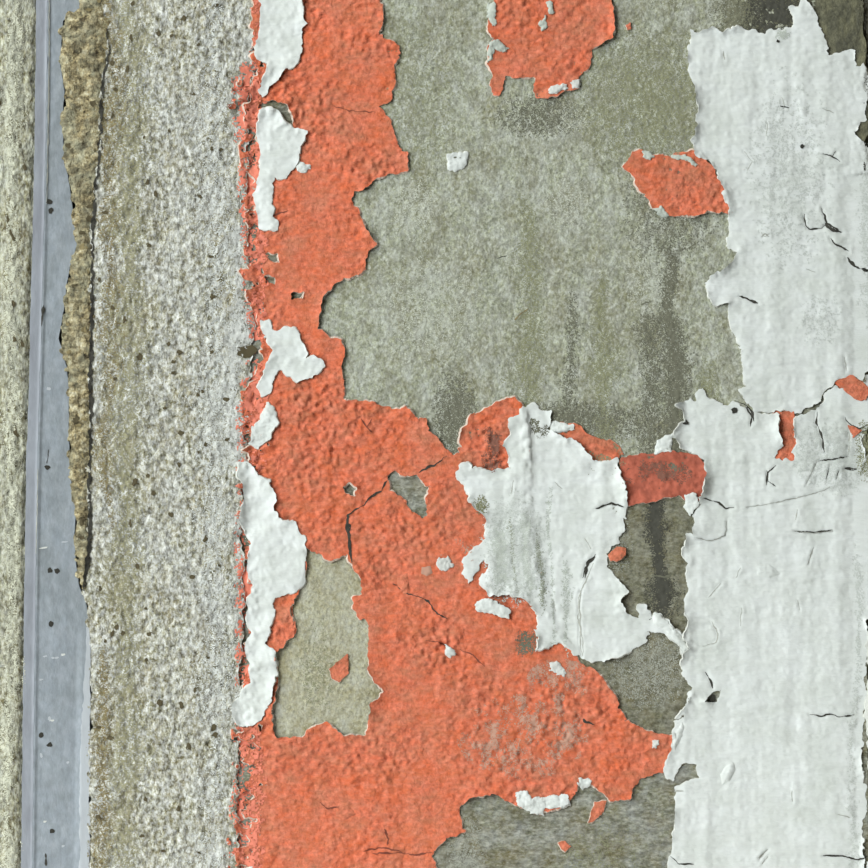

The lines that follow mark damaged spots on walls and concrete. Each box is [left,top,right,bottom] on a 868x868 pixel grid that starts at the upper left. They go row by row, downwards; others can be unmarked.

damp [708,0,800,39]
crack [82,29,111,591]
peeling [318,0,868,458]
damp [490,25,722,475]
crack [804,208,868,272]
crack [345,474,391,568]
damp [608,498,685,620]
crack [699,417,857,563]
peeling [272,548,381,738]
damp [605,632,688,713]
peeling [433,763,699,868]
crack [823,853,866,861]